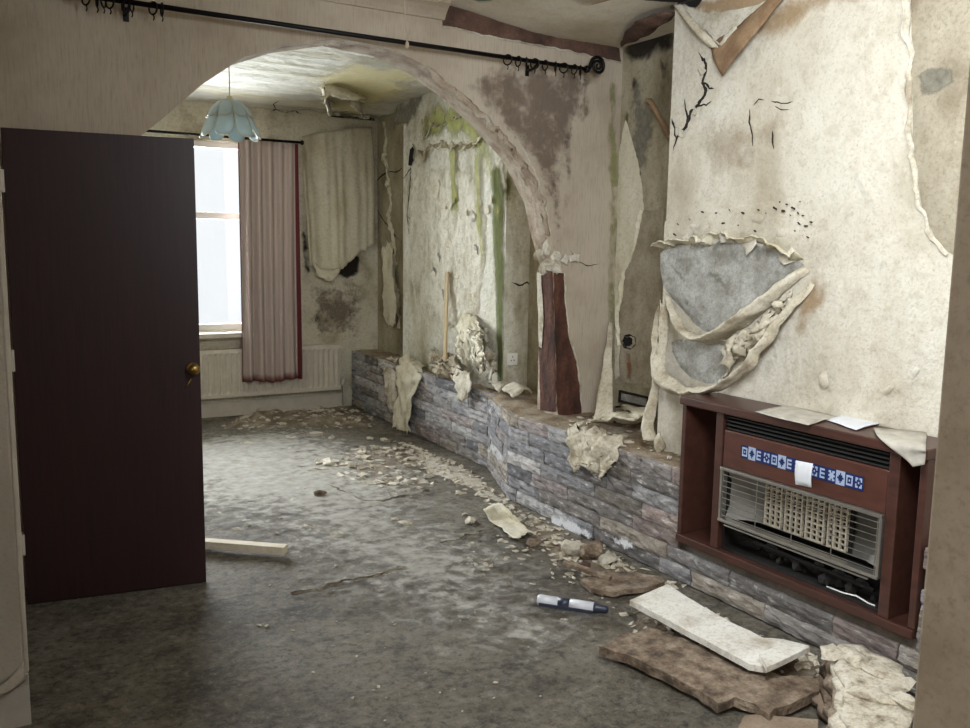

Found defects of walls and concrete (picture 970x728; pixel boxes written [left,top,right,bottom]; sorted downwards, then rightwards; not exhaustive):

spalling [690,1,765,46]
spalling [323,85,375,121]
spalling [428,67,550,237]
damp [482,72,587,194]
peeling [645,98,670,140]
crack [672,52,714,149]
crack [748,99,793,149]
spalling [901,0,970,256]
peeling [408,144,492,328]
spalling [614,119,804,388]
damp [316,290,356,330]